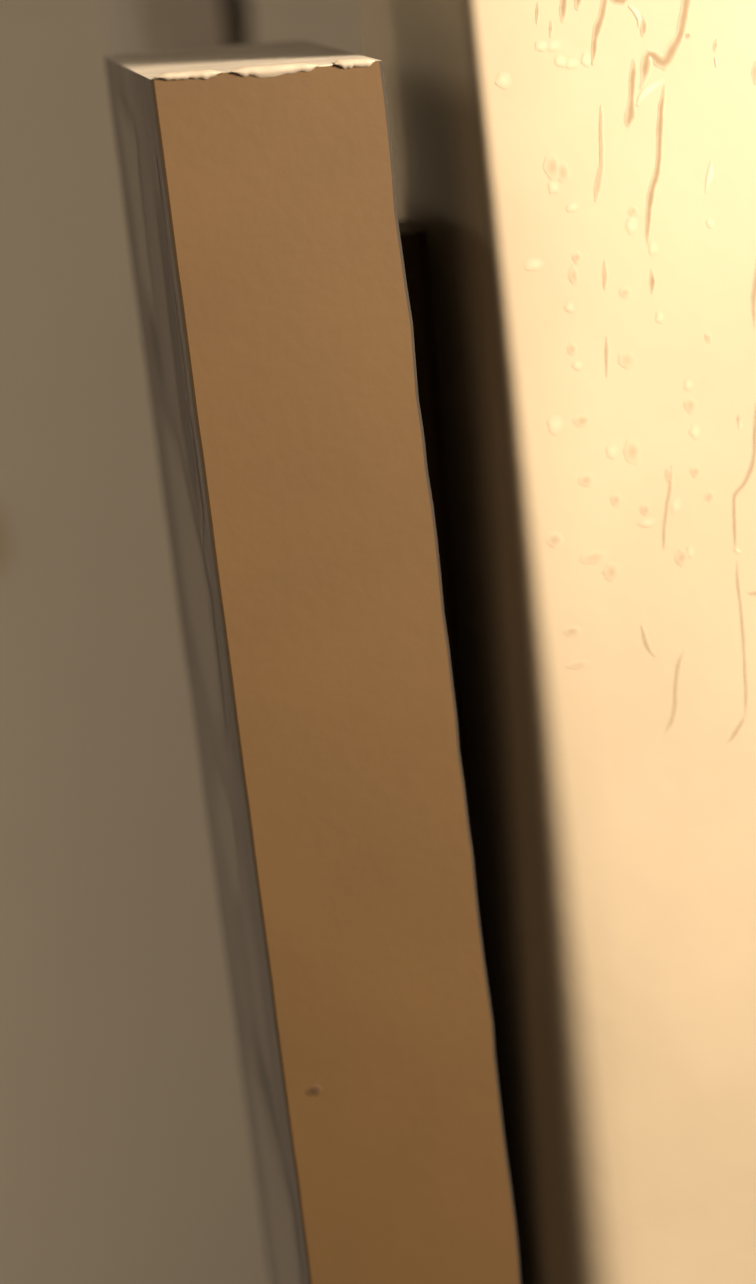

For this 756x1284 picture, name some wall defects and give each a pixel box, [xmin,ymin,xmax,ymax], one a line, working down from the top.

crack [536,0,692,294]
crack [603,336,611,377]
crack [748,268,756,327]
crack [726,407,756,743]